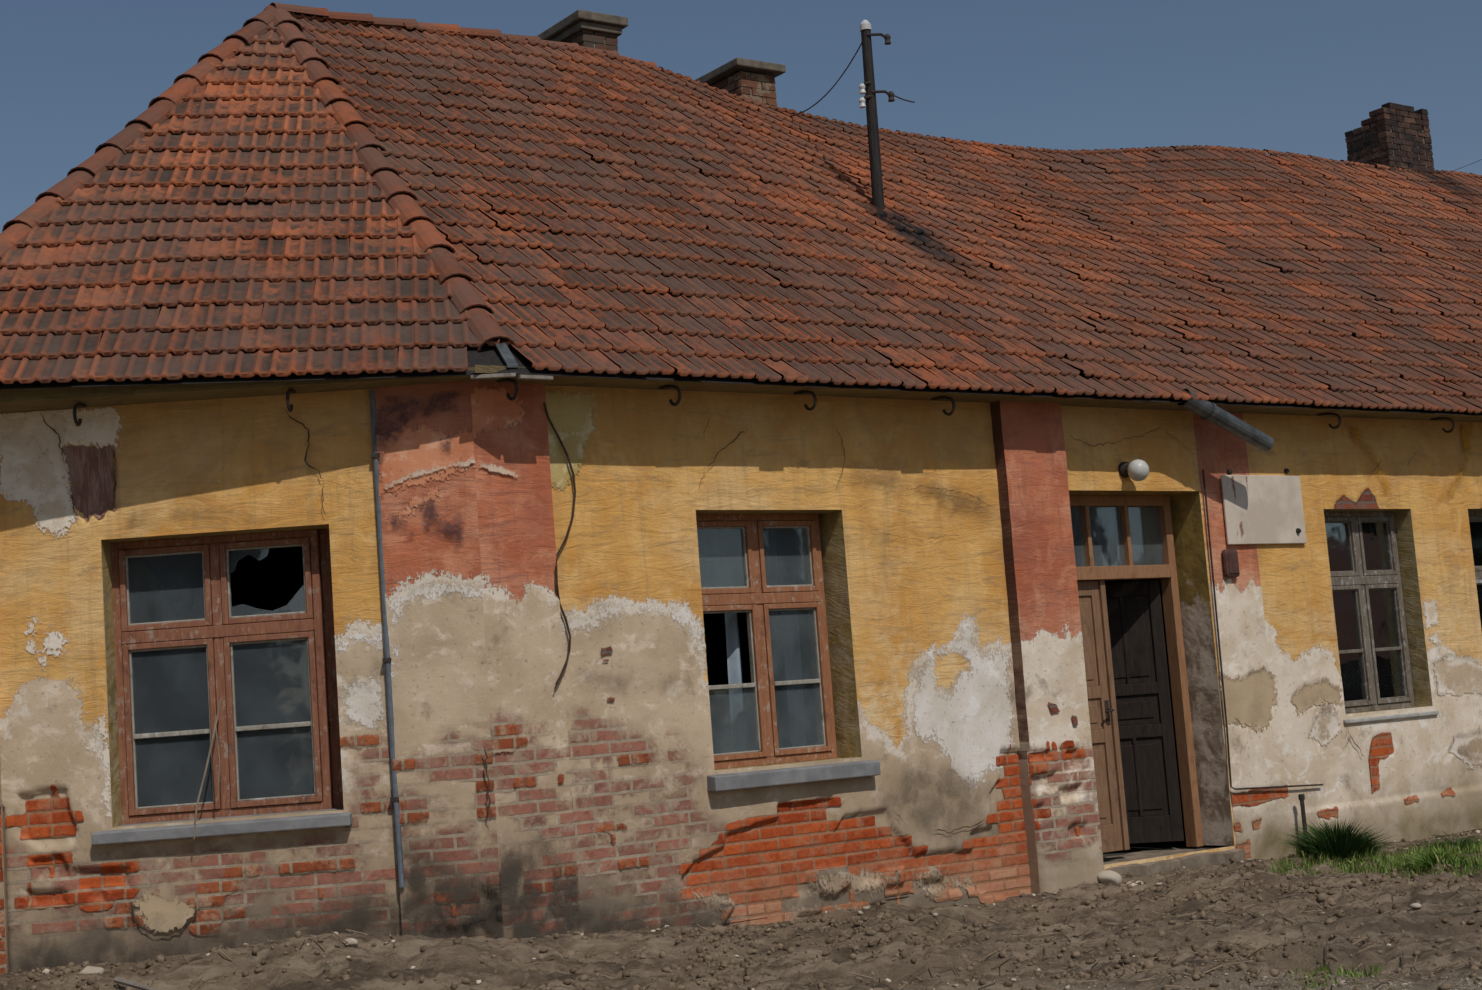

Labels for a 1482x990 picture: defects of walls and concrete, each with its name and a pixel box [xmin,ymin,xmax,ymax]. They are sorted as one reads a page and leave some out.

peeling [0,407,124,538]
crack [285,409,325,513]
crack [699,420,748,486]
peeling [1211,578,1482,860]
peeling [0,568,1104,975]
leakage [287,854,672,939]
leakage [21,940,190,971]